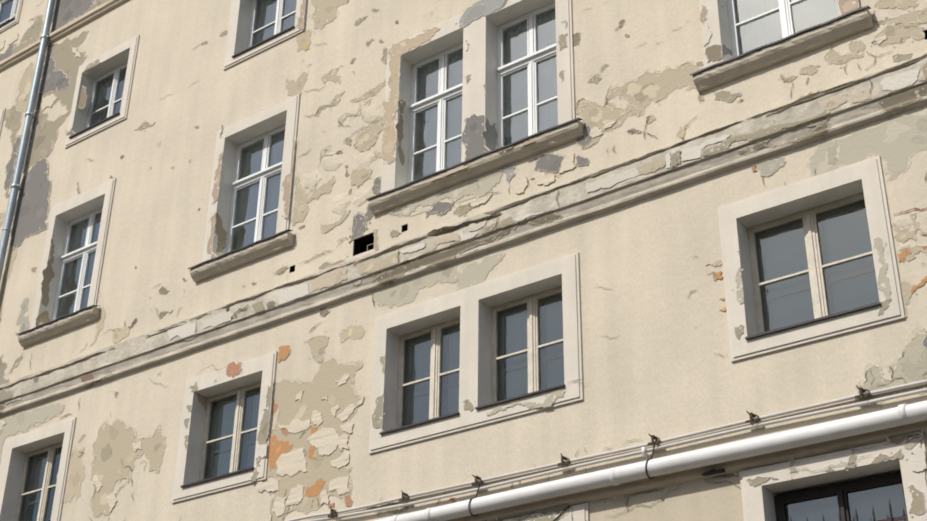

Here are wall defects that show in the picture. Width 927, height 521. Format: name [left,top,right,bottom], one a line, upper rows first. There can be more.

flaking render [0,0,108,326]
peeling [144,0,927,341]
peeling [90,418,166,518]
peeling [251,331,365,521]
peeling [372,394,385,431]
peeling [855,326,927,409]
peeling [870,429,927,472]
peeling [907,484,926,517]